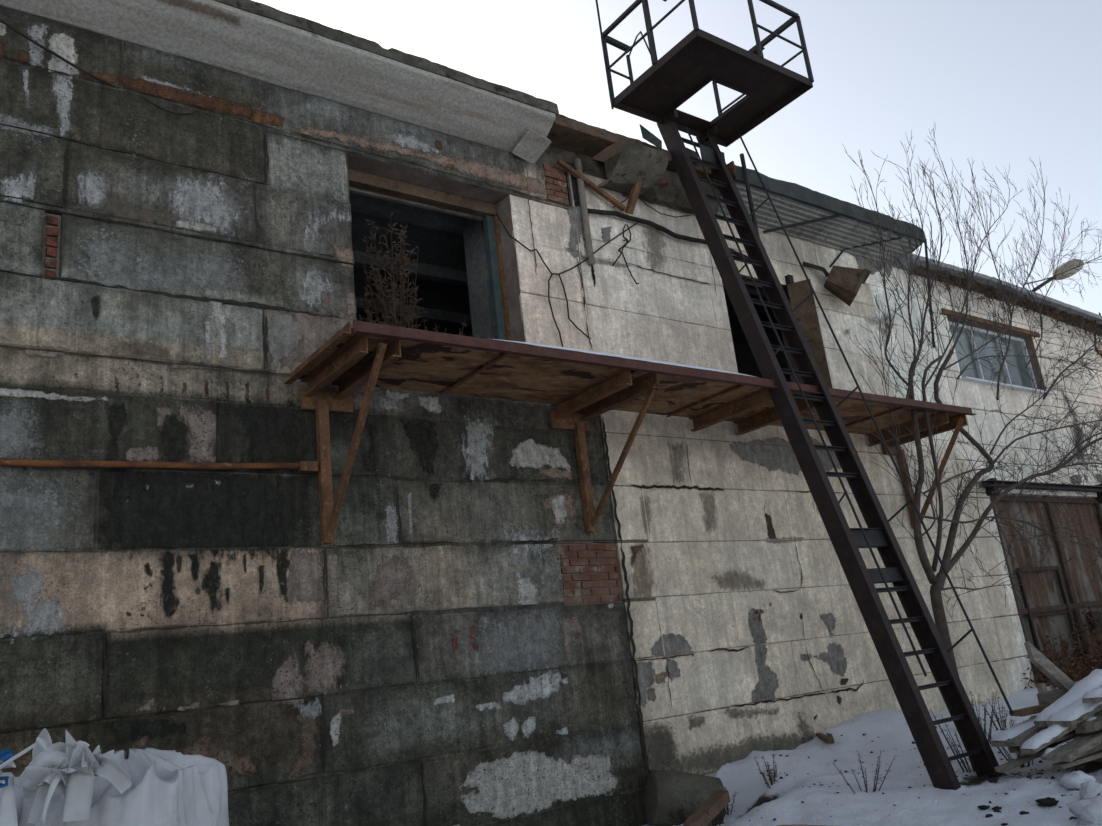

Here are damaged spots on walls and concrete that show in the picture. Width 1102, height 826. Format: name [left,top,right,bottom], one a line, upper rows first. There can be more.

rust [80,73,285,127]
peeling [294,124,546,194]
peeling [509,438,577,530]
leakage [176,551,230,615]
leakage [243,550,290,600]
crack [602,417,749,776]
crack [774,544,803,593]
crack [731,616,864,707]
peeling [133,697,200,713]
peeling [270,640,354,782]
peeling [433,694,455,706]
peeling [459,672,618,819]